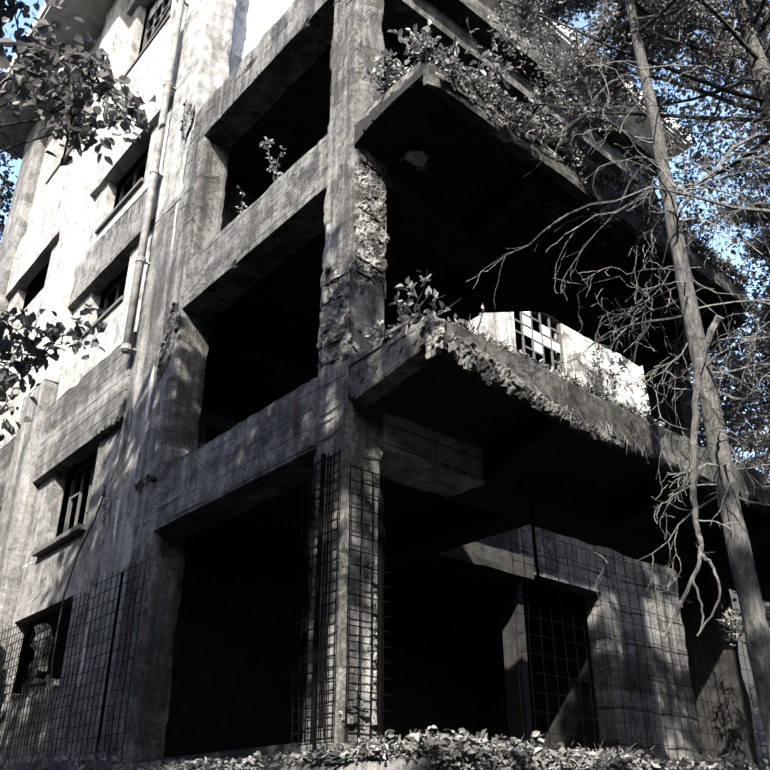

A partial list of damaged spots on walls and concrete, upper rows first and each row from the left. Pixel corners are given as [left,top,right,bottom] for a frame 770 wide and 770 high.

spalling [156,302,182,381]
spalling [316,146,623,447]